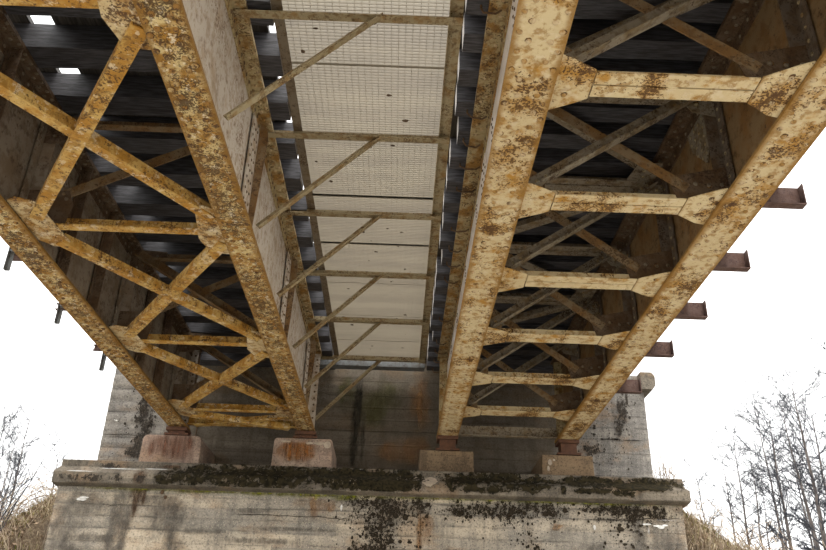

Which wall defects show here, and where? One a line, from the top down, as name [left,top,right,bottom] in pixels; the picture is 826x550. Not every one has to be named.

water stain [50,389,220,550]
water stain [350,386,364,470]
water stain [335,496,688,550]